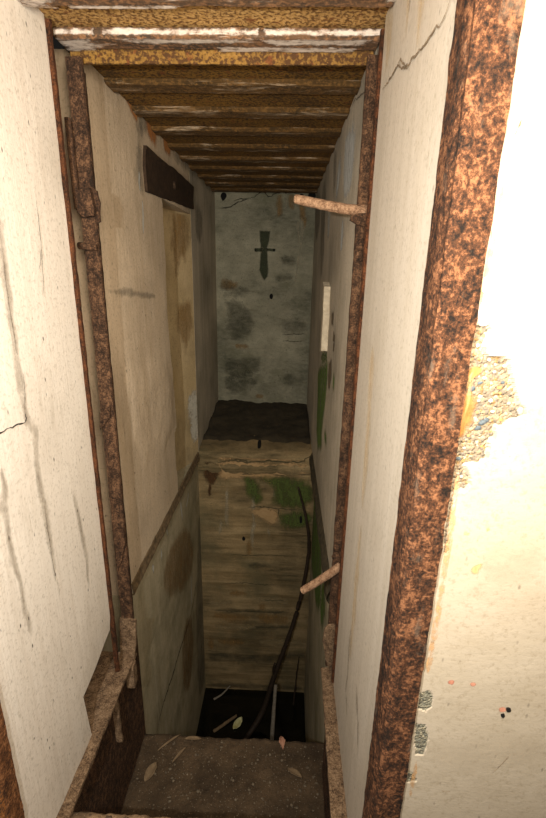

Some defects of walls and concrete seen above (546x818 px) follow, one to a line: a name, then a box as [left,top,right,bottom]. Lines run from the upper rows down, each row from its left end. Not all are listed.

crack [383,1,450,88]
rust [459,367,481,436]
spalling [444,326,524,553]
spalling [418,690,433,711]
spalling [414,723,428,754]